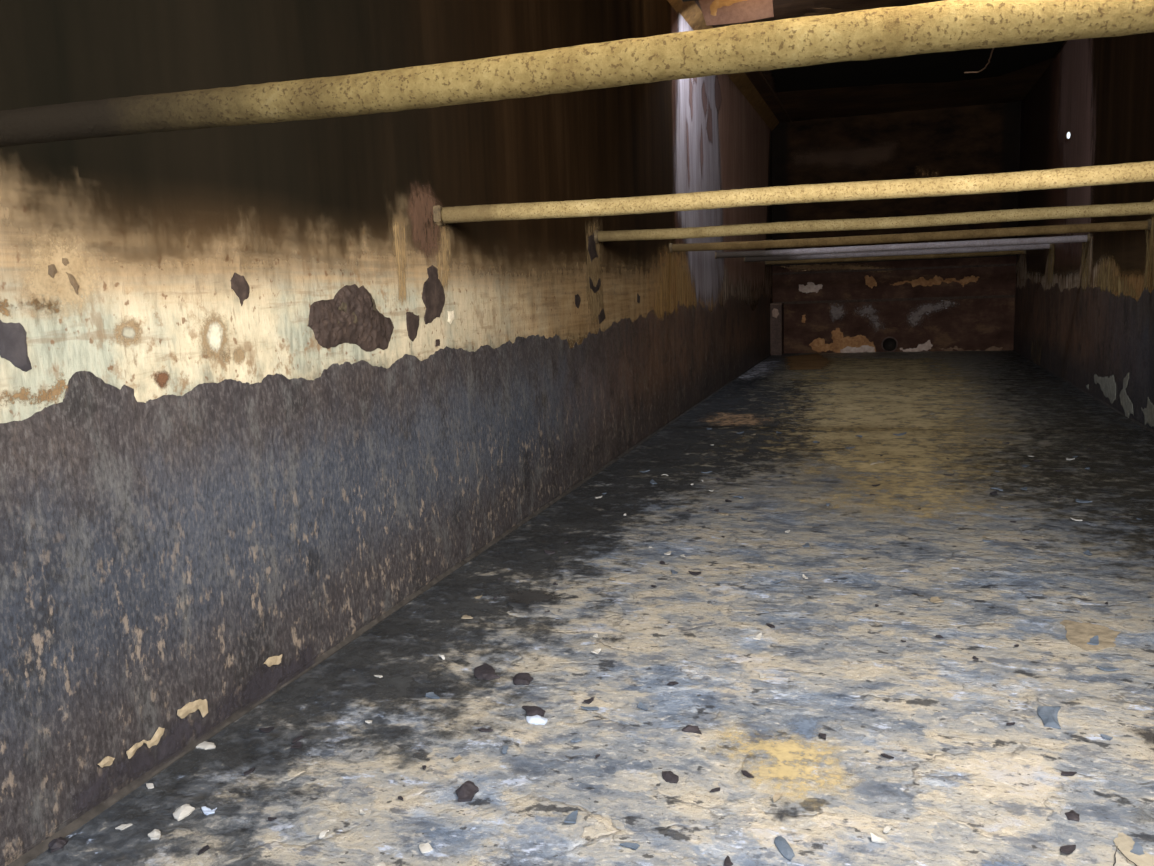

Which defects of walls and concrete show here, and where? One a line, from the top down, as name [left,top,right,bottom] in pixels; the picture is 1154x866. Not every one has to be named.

peeling [230,273,250,306]
leakage [0,194,772,423]
peeling [406,265,455,342]
leakage [1016,229,1154,301]
peeling [0,320,32,372]
peeling [1086,372,1154,427]
leakage [498,590,559,605]